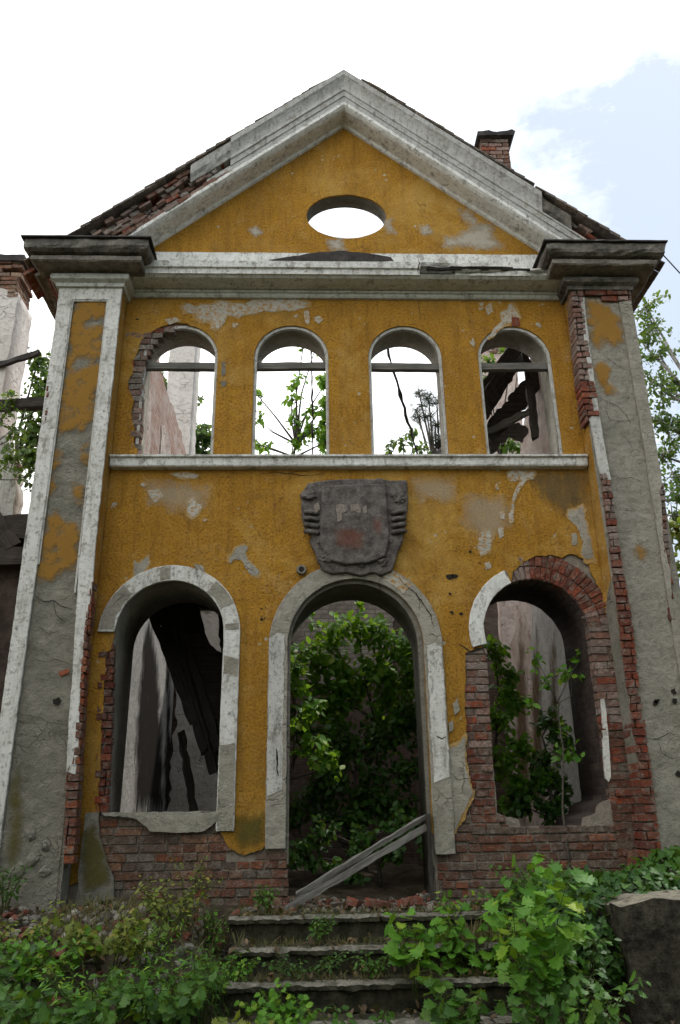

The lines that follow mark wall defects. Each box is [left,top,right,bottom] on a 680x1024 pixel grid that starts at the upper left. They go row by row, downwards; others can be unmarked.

peeling [445,210,498,250]
peeling [126,299,324,454]
flaking render [566,290,632,430]
peeling [141,483,163,502]
peeling [170,471,199,480]
peeling [185,496,207,522]
peeling [227,543,262,579]
peeling [384,571,411,594]
flaking render [427,469,677,905]
flaking render [58,554,289,906]